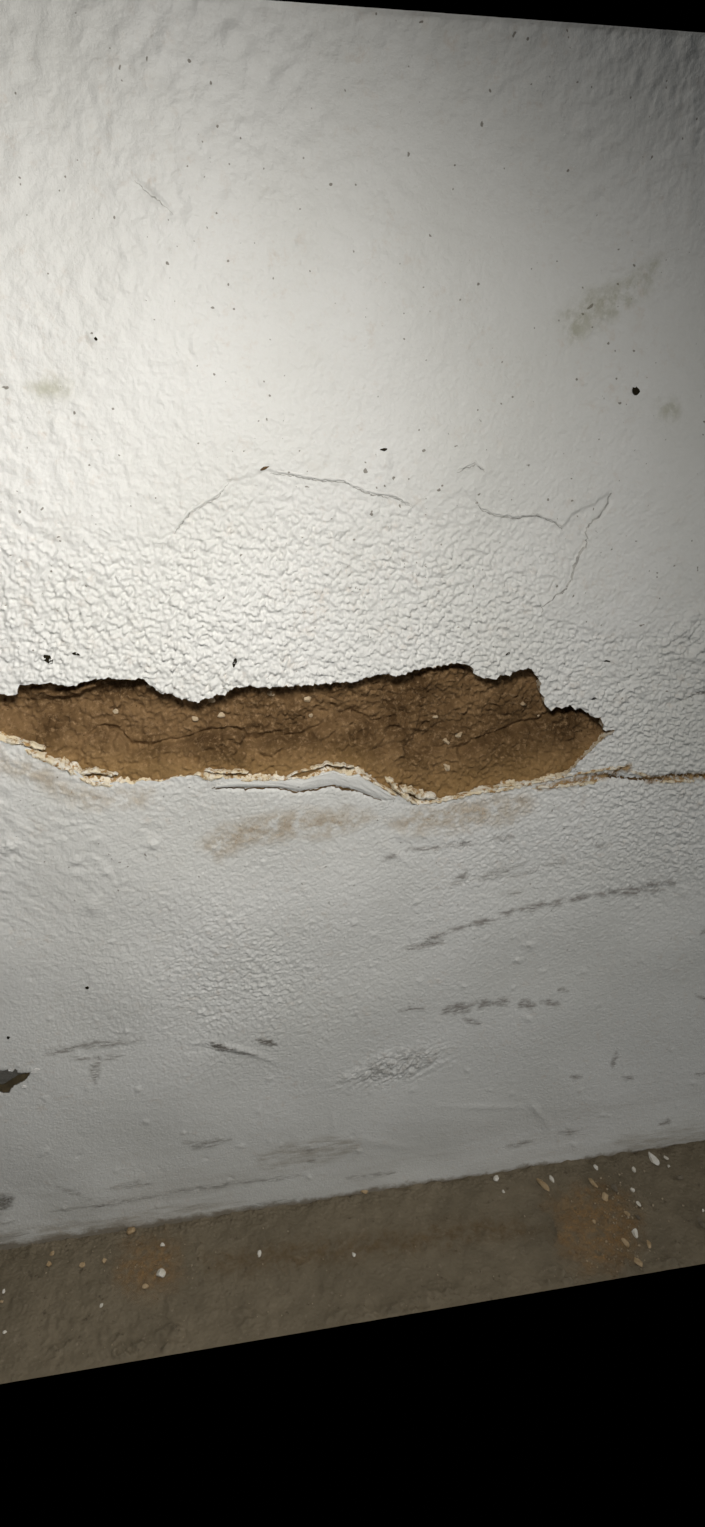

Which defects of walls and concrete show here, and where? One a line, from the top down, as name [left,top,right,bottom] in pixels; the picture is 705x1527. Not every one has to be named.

spalling [0,652,627,805]
crack [607,766,705,783]
peeling [0,1068,40,1096]